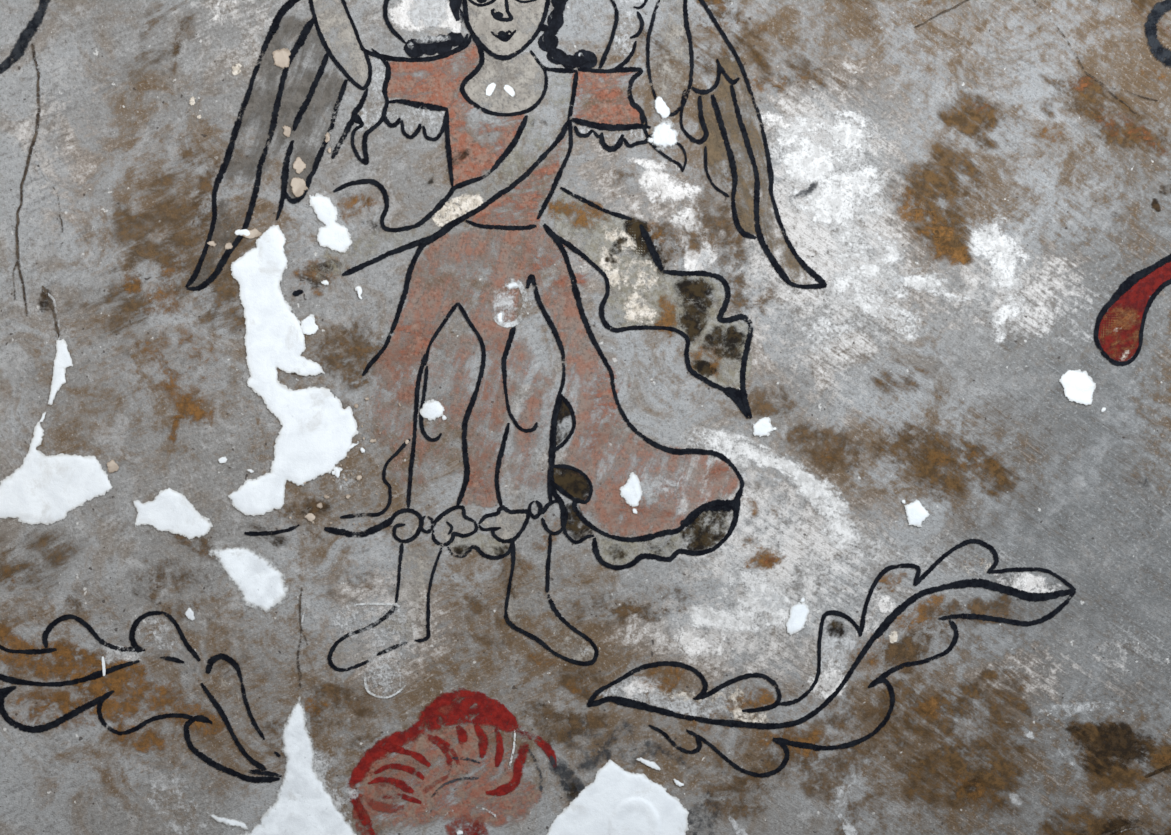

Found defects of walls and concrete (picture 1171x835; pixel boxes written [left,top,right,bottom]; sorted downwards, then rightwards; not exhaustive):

flaking render [272,48,291,69]
crack [13,44,63,340]
flaking render [290,157,352,253]
flaking render [0,338,119,525]
flaking render [207,225,381,524]
flaking render [1059,369,1106,412]
flaking render [133,488,213,539]
flaking render [209,547,288,612]
flaking render [201,697,358,835]
flaking render [546,758,689,835]